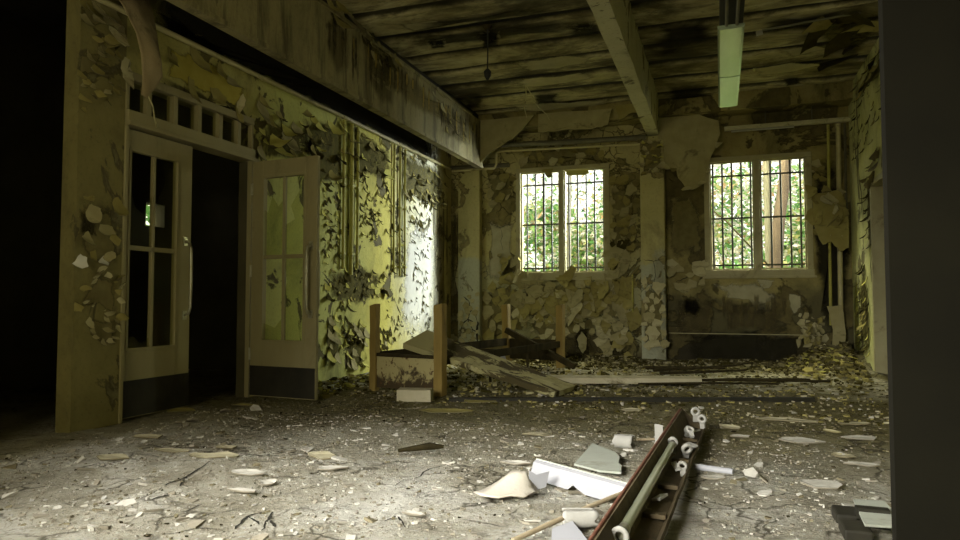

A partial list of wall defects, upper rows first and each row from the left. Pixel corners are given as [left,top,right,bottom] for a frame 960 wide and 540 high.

peeling [79,0,126,30]
leakage [417,10,598,48]
leakage [768,13,838,31]
peeling [755,16,879,76]
leakage [152,0,435,158]
leakage [671,86,706,100]
peeling [849,50,881,251]
peeling [168,46,450,370]
peeling [72,196,129,346]
peeling [457,136,774,356]
flaking render [789,294,801,313]